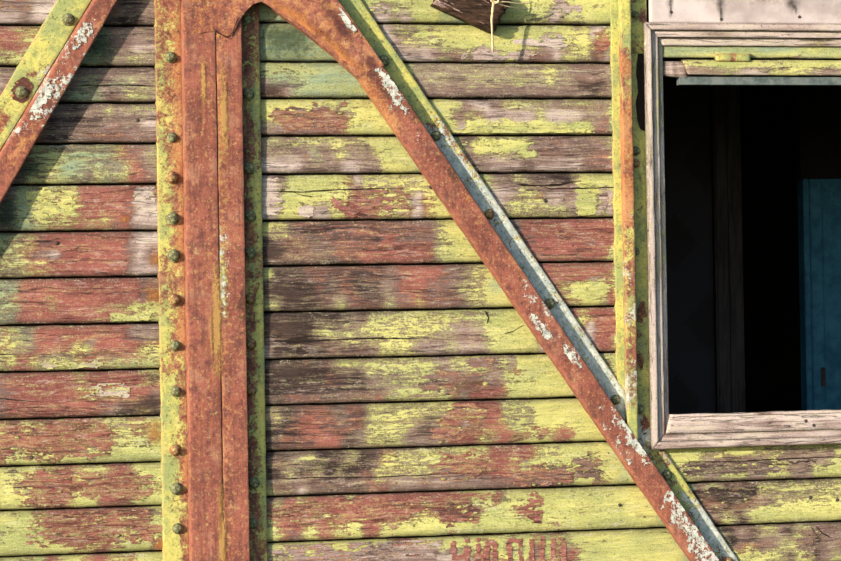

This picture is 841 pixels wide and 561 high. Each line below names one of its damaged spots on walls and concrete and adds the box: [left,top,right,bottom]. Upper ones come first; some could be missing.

rust [271,3,357,71]
peeling [336,3,361,37]
rust [219,68,228,148]
peeling [369,68,409,115]
peeling [446,124,595,158]
rust [209,266,222,376]
rust [636,299,647,327]
peeling [0,420,163,550]
rust [218,480,226,561]
peeling [267,492,494,528]
peeling [513,405,652,524]
peeling [659,491,719,561]